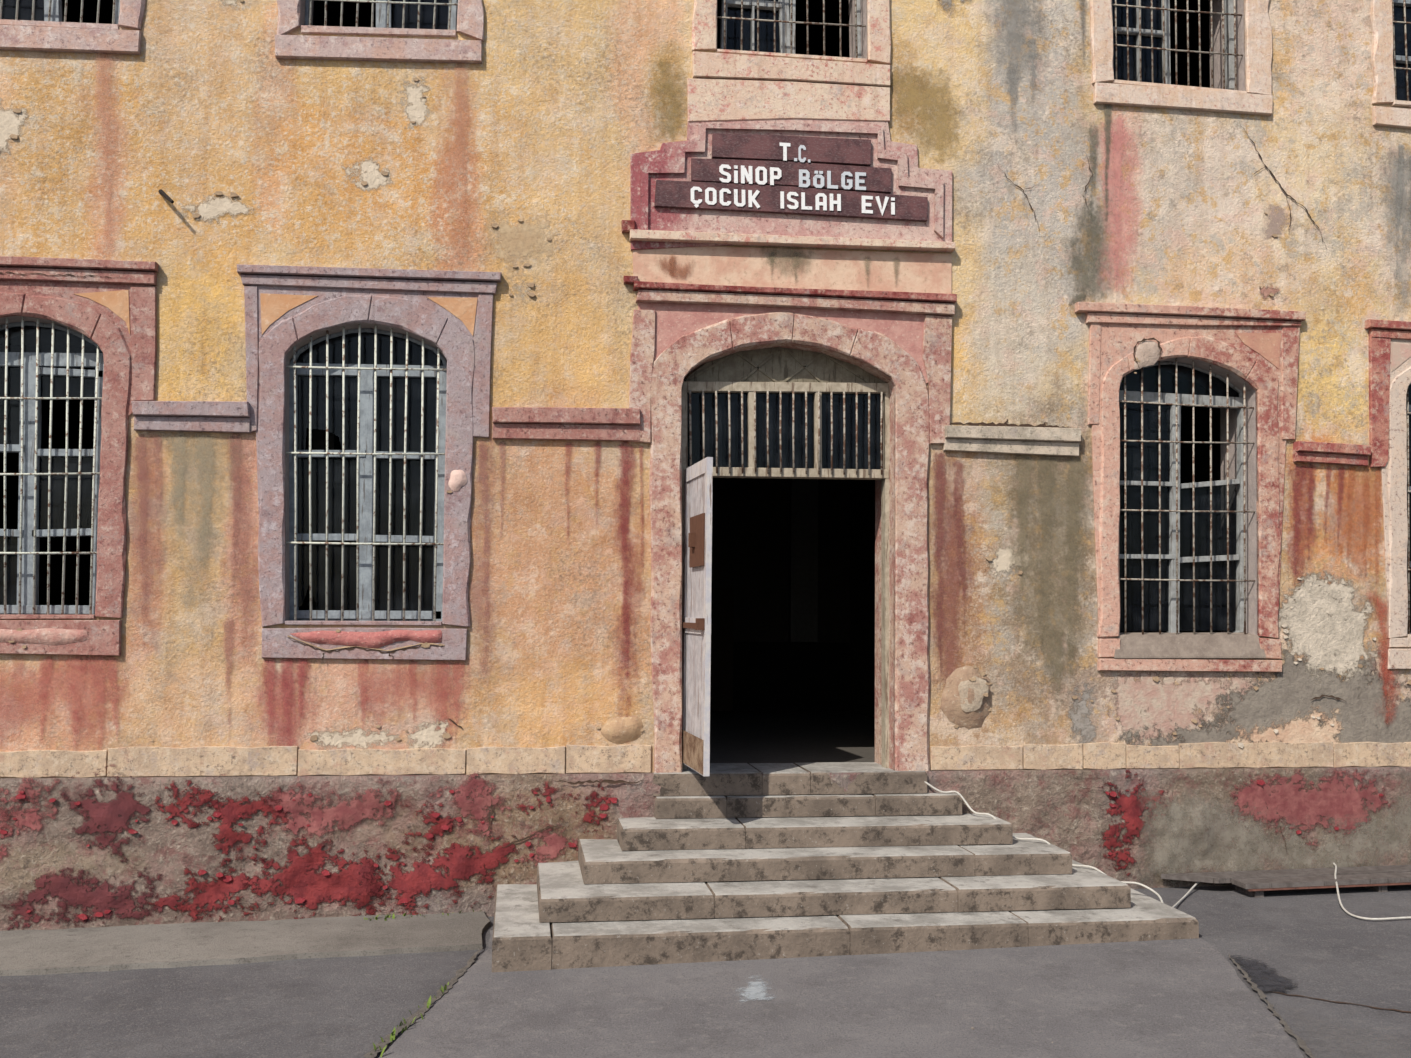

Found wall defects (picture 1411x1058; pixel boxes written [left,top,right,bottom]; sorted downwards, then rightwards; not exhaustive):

peeling [0,99,28,153]
peeling [178,191,256,223]
peeling [342,157,393,191]
peeling [399,76,433,127]
damp [999,0,1040,104]
damp [1071,104,1111,302]
crack [1241,126,1327,249]
damp [1014,454,1086,683]
rust [1293,467,1380,567]
spalling [1278,569,1382,683]
peeling [1068,671,1391,848]
peeling [0,764,617,931]